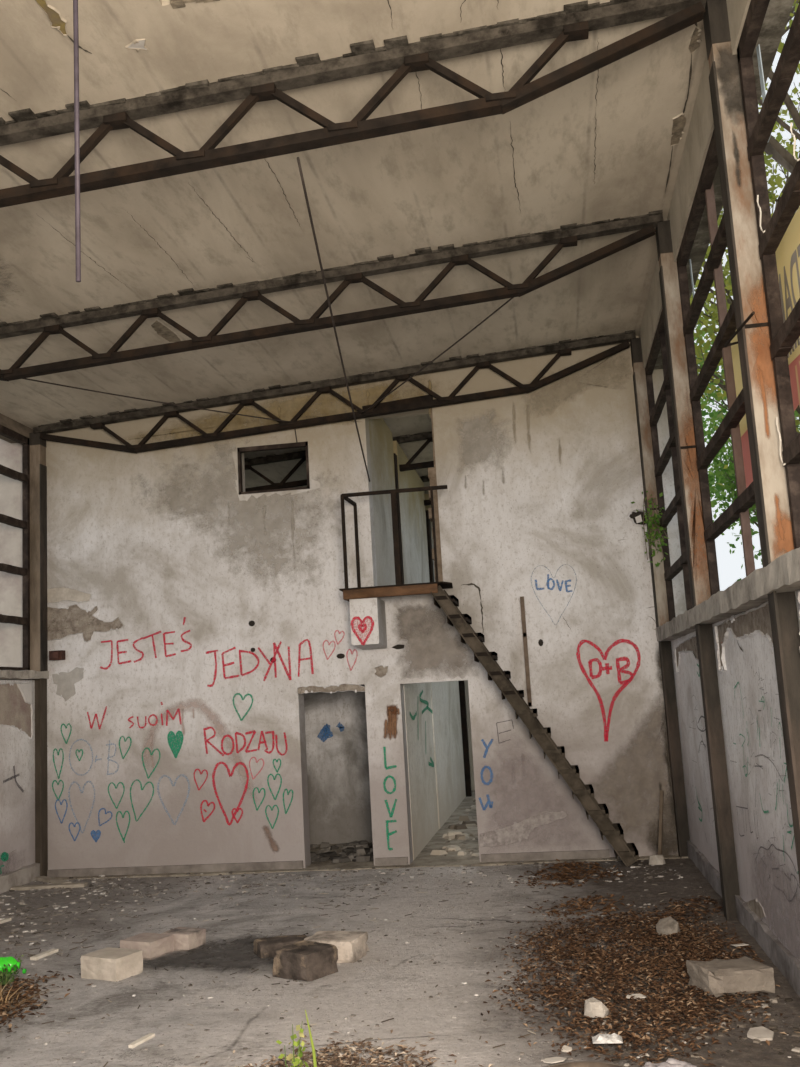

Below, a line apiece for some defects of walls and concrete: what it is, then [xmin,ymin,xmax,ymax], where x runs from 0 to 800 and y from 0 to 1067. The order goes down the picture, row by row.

spalling [35,0,92,54]
crack [510,123,521,211]
corrosion [751,280,777,436]
corrosion [685,419,708,574]
corrosion [774,495,794,553]
peeling [47,587,124,643]
peeling [0,682,33,741]